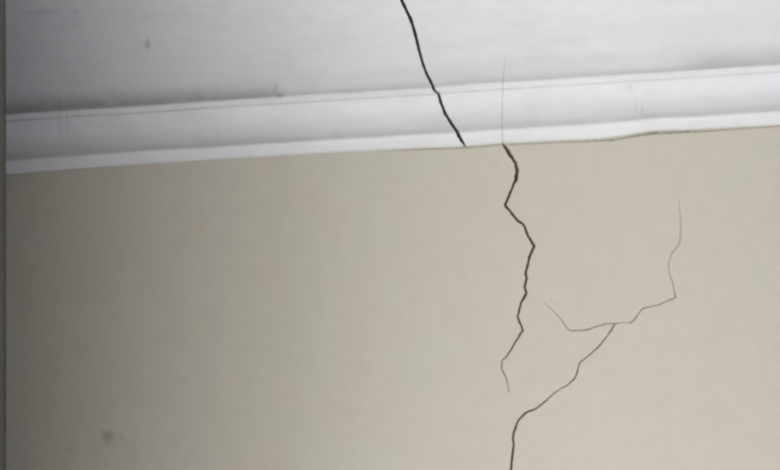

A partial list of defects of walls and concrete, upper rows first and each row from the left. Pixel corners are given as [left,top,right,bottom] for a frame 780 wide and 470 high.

crack [399,0,466,147]
crack [501,61,537,392]
crack [508,205,681,470]